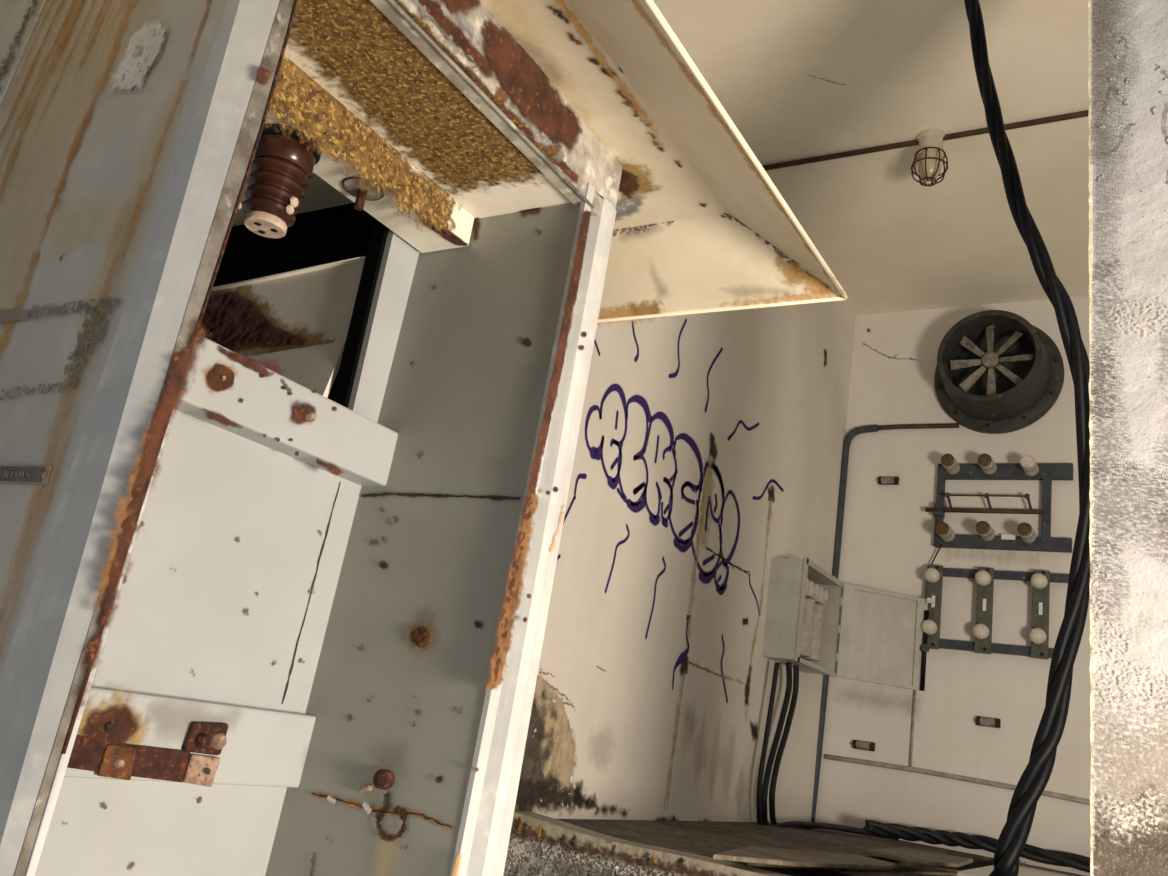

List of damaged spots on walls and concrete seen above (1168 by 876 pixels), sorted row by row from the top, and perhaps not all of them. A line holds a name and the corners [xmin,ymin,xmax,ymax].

crack [862,342,916,360]
water stain [574,783,627,816]